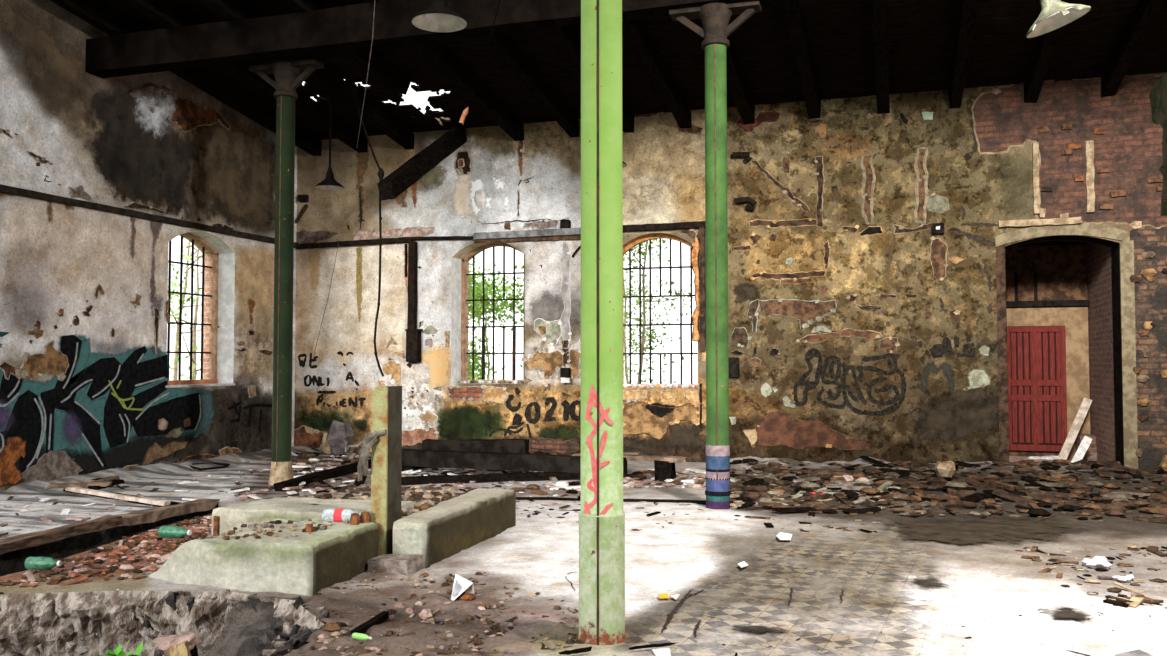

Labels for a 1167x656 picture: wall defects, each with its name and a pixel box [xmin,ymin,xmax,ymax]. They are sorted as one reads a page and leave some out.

leakage [0,0,276,302]
spalling [168,97,231,132]
spalling [806,119,827,140]
spalling [730,147,967,368]
spalling [962,73,1167,472]
spalling [0,283,105,381]
peeling [0,436,83,487]
spalling [729,382,870,451]